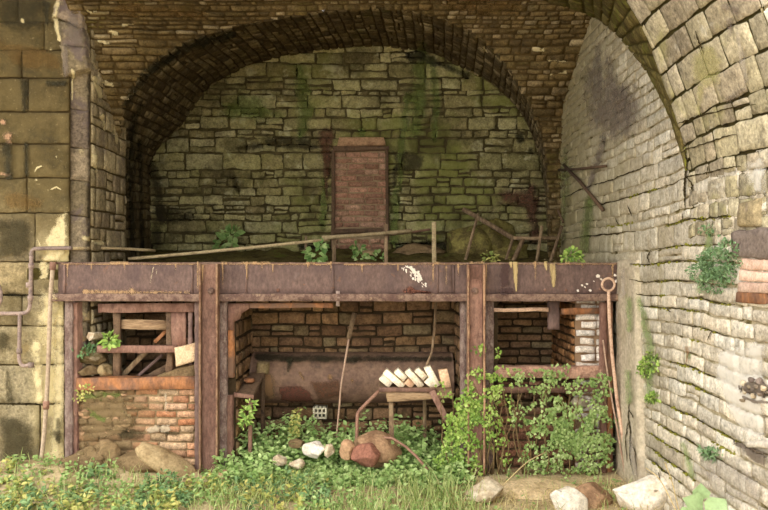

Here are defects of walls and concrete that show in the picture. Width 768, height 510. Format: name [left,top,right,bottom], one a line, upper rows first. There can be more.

crack [561,134,741,238]
corrosion [238,261,332,277]
peeling [403,266,427,287]
crack [625,402,751,484]